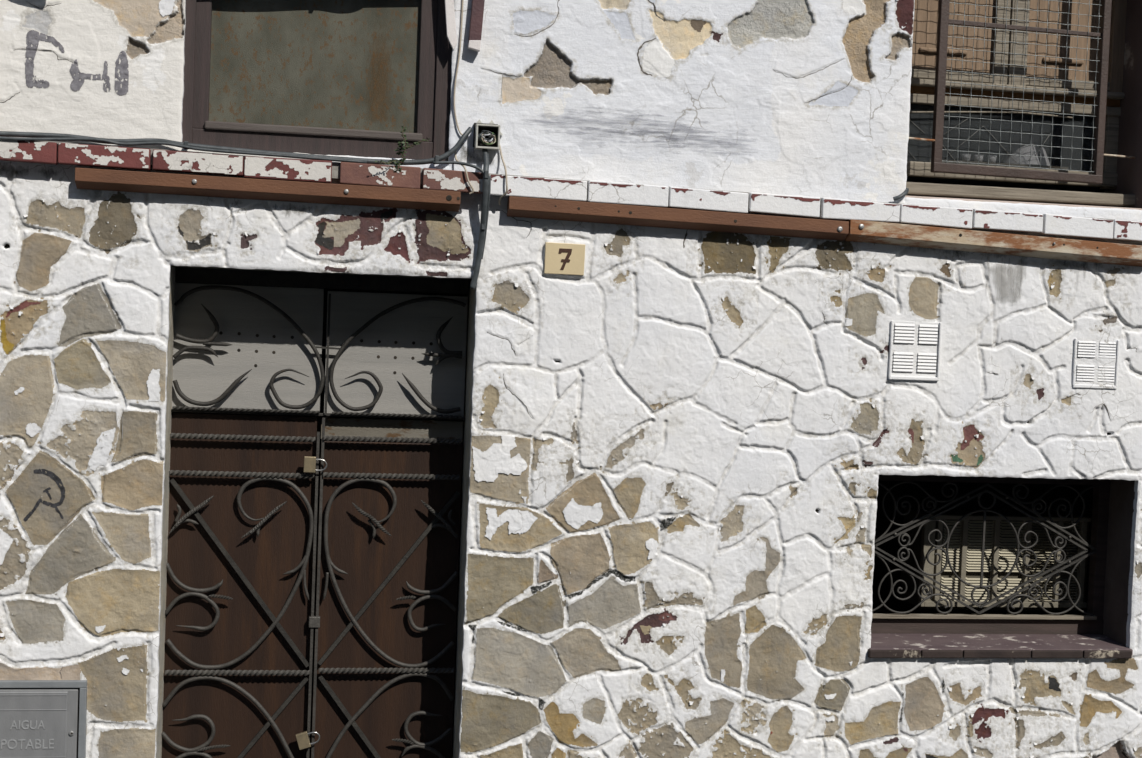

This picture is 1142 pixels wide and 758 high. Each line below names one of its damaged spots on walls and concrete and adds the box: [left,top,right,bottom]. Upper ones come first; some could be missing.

peeling [94,0,184,59]
spalling [502,40,612,104]
peeling [599,0,631,9]
spalling [642,0,814,77]
spalling [809,0,914,107]
peeling [0,140,331,181]
peeling [360,165,406,185]
peeling [314,208,471,276]
peeling [0,191,166,758]
peeling [460,374,1142,758]